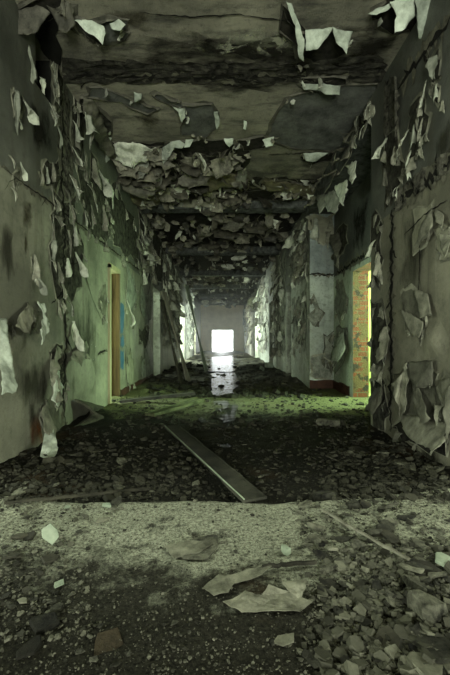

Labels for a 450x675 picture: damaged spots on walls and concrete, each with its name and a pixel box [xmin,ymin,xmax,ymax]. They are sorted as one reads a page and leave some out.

leakage [222,33,285,52]
crack [1,71,381,425]
peeling [0,0,450,457]
crack [385,152,450,432]